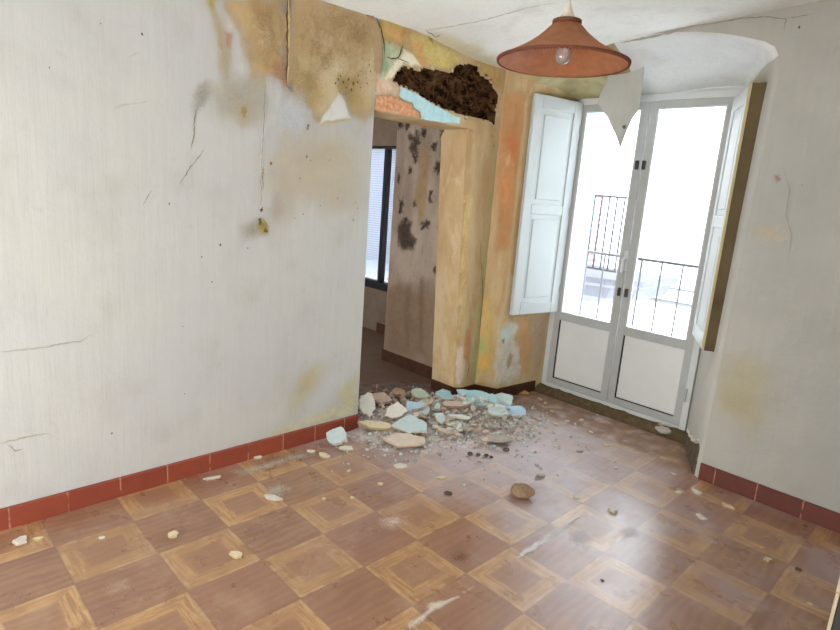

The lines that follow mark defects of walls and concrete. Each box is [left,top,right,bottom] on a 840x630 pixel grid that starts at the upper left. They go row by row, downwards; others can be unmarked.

flaking render [367,15,501,127]
peeling [320,93,351,126]
peeling [597,67,644,148]
water stain [396,122,444,251]
crack [1,334,92,352]
crack [0,434,50,452]
flaking render [684,428,701,475]